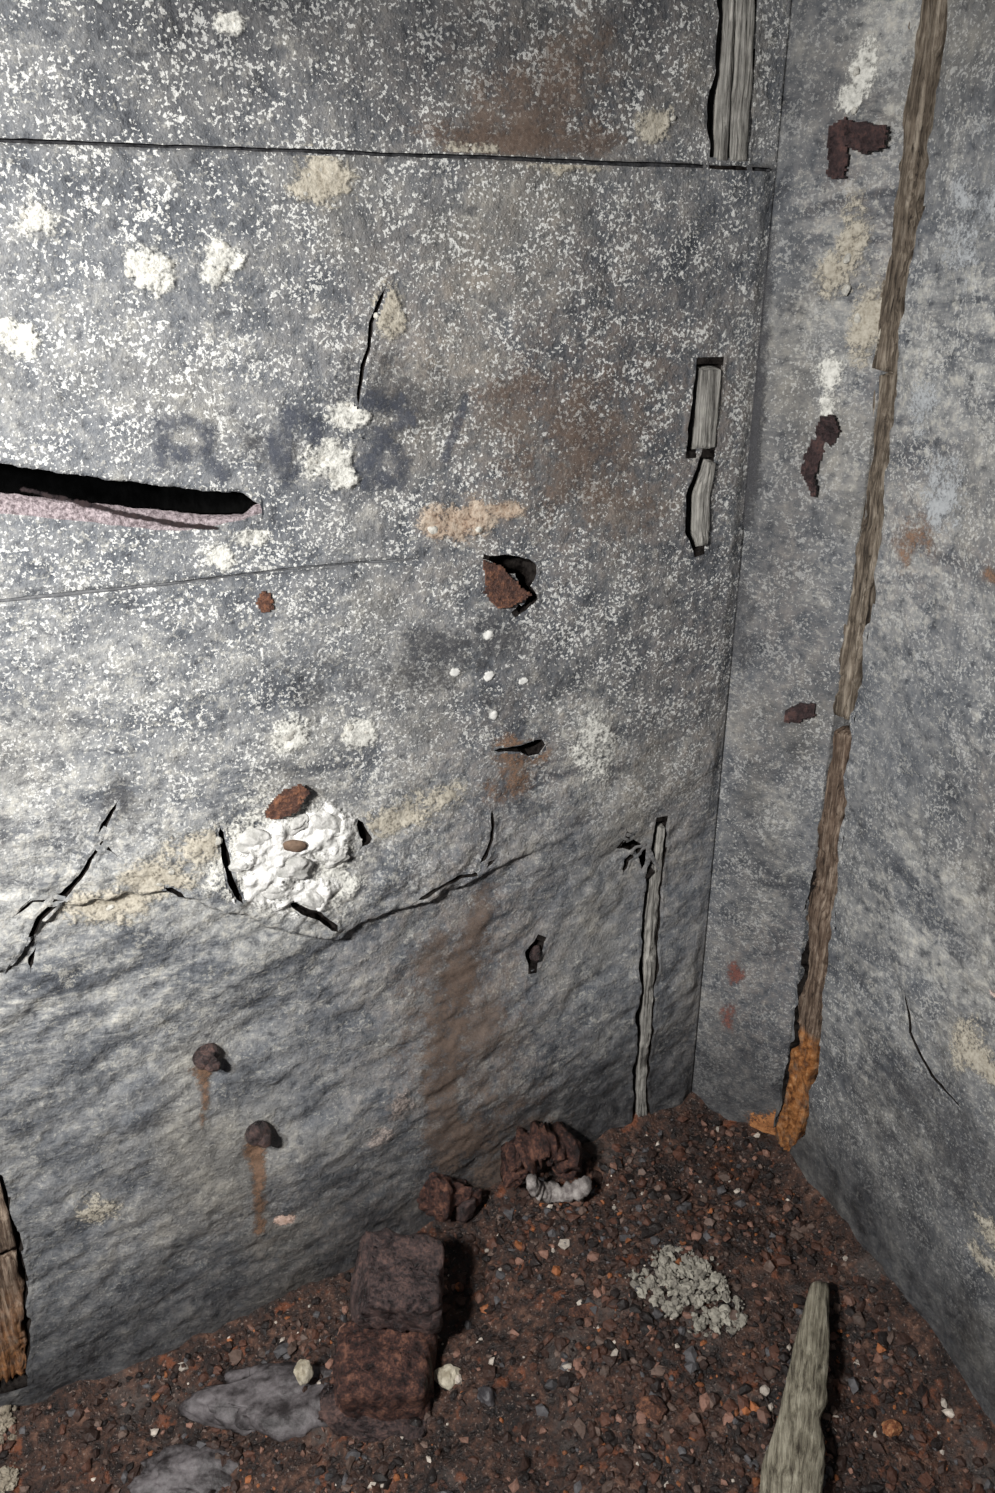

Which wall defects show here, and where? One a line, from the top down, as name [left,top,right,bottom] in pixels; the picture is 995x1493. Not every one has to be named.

crack [680,357,729,559]
rust [800,414,841,497]
rust [483,560,532,608]
crack [0,794,126,978]
crack [162,820,247,910]
spalling [198,782,368,923]
crack [286,901,345,937]
crack [351,811,378,854]
crack [411,804,500,905]
rust [192,1066,210,1126]
rust [245,1143,266,1235]
crack [0,1150,38,1394]